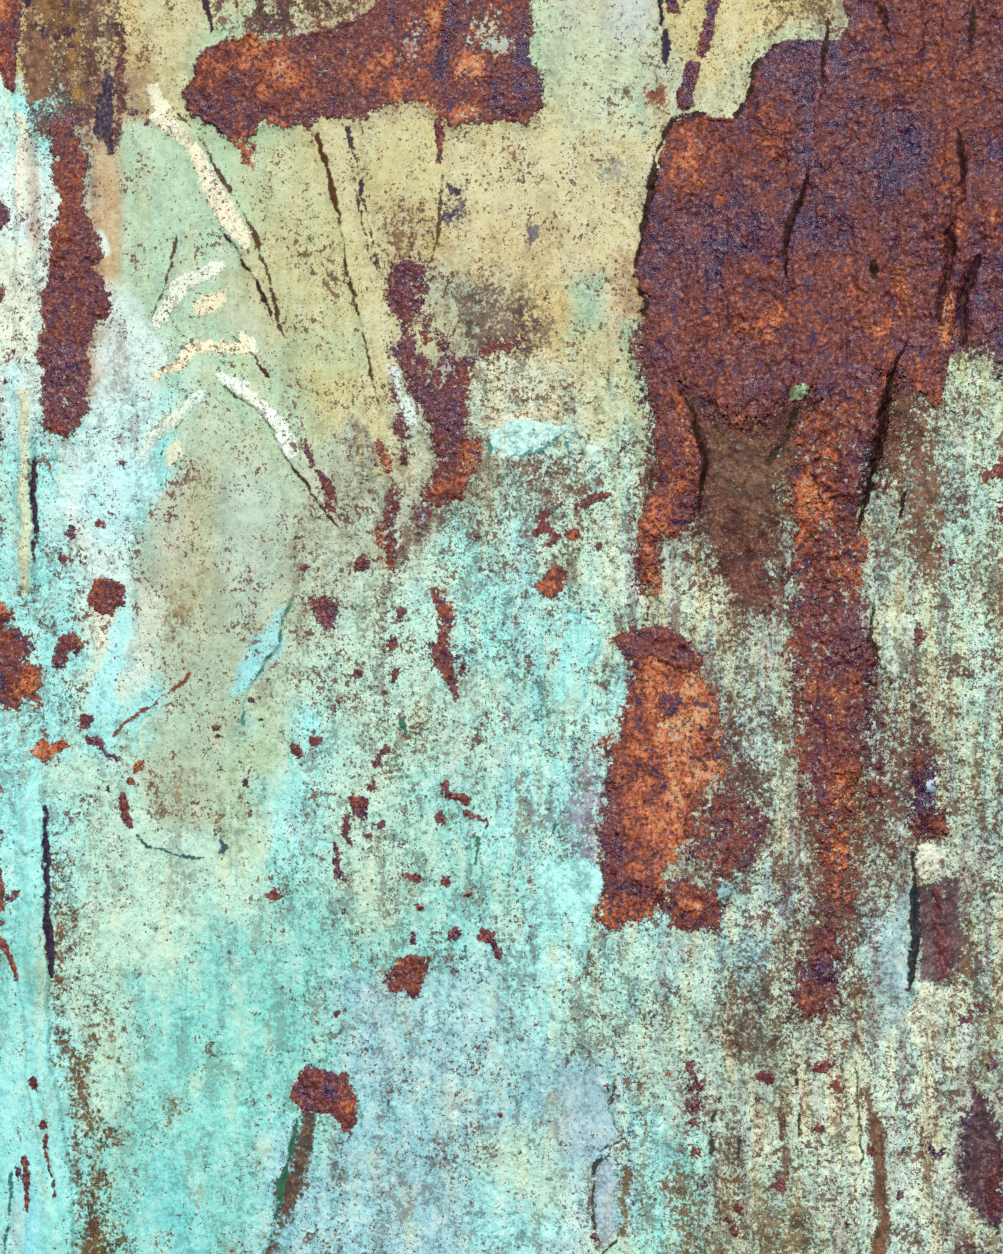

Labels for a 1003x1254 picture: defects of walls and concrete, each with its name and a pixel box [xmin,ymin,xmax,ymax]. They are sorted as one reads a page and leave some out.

rust [181,0,546,172]
rust [34,111,113,442]
rust [353,254,538,576]
rust [64,524,77,540]
rust [589,0,1003,1034]
rust [0,578,127,720]
crack [41,805,56,978]
crack [905,851,921,992]
rust [289,1060,359,1141]
rust [986,1051,998,1074]